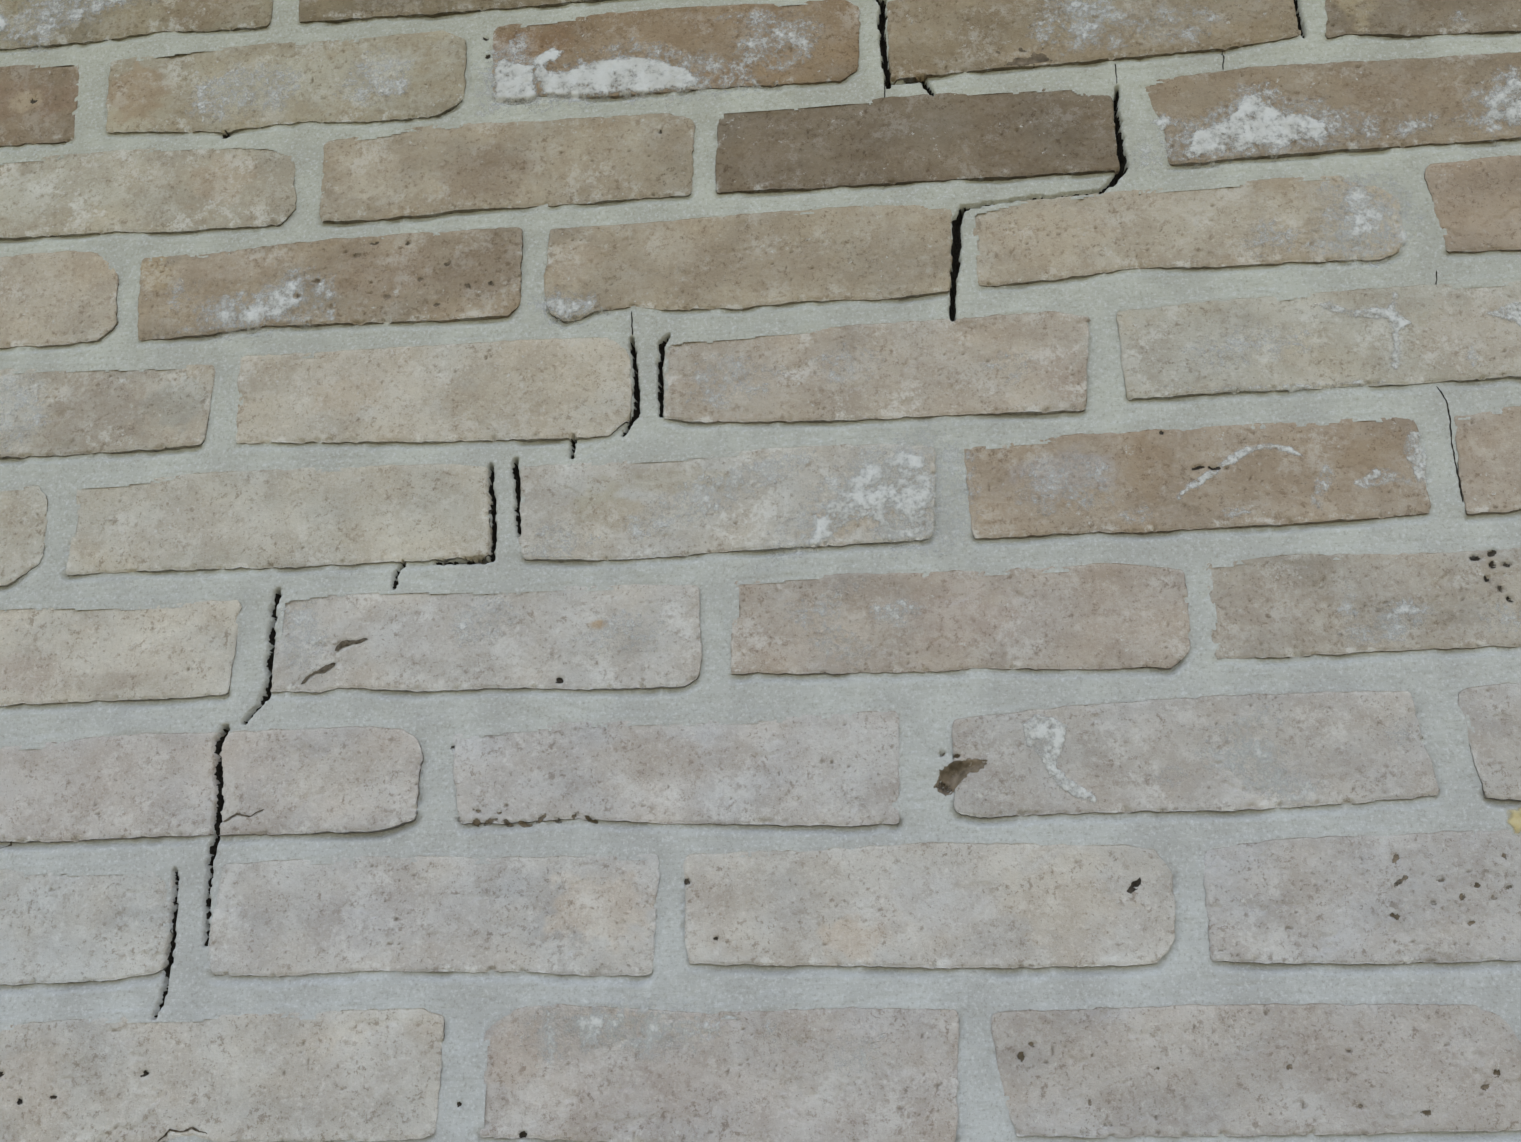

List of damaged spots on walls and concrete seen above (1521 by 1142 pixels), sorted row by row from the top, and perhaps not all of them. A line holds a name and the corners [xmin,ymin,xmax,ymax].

crack [876,0,934,98]
crack [1032,64,1128,200]
crack [949,205,990,322]
crack [623,311,669,436]
crack [570,439,578,459]
crack [393,463,521,589]
crack [154,593,367,1018]
crack [157,1127,207,1142]